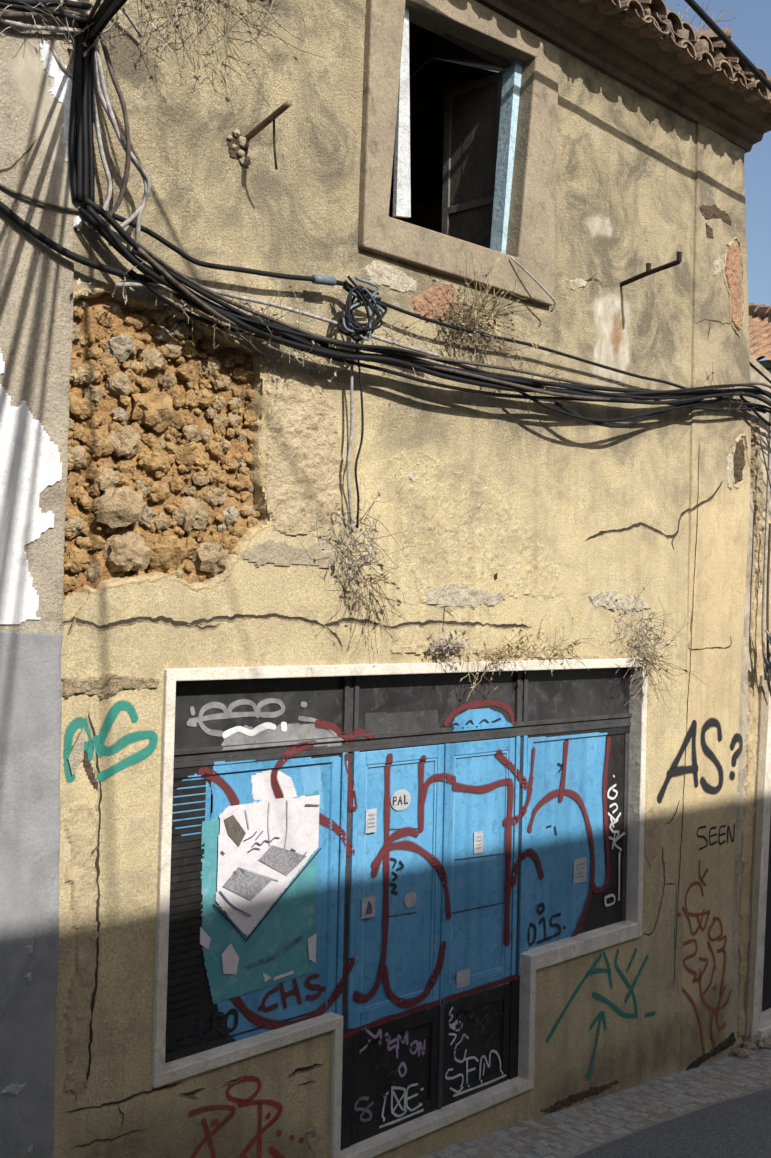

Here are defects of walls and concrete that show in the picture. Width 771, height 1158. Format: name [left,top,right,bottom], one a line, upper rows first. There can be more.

peeling [38,37,76,171]
spalling [412,284,456,323]
spalling [699,204,744,338]
flaking render [0,284,345,626]
crack [62,607,532,651]
crack [585,445,732,719]
crack [66,708,246,1148]
crack [643,751,686,990]
crack [288,1063,324,1087]